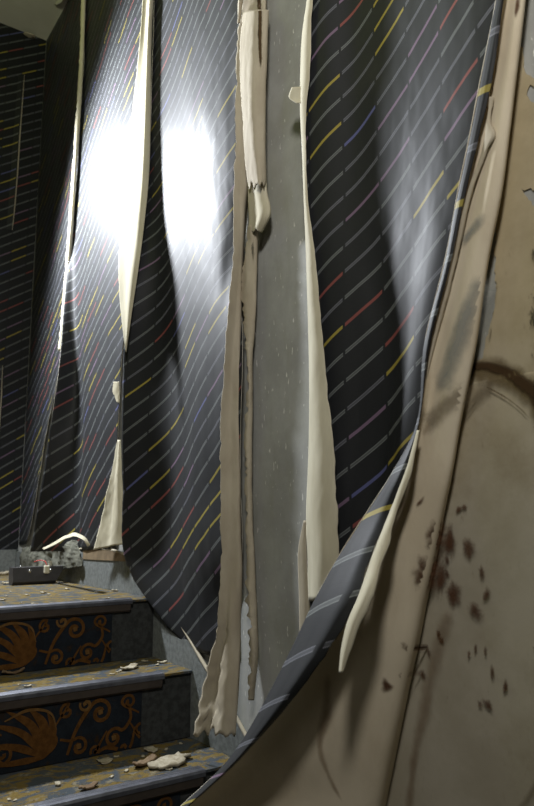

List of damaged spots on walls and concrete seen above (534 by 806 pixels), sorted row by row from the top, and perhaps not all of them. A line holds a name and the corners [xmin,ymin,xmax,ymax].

leakage [472,361,534,414]